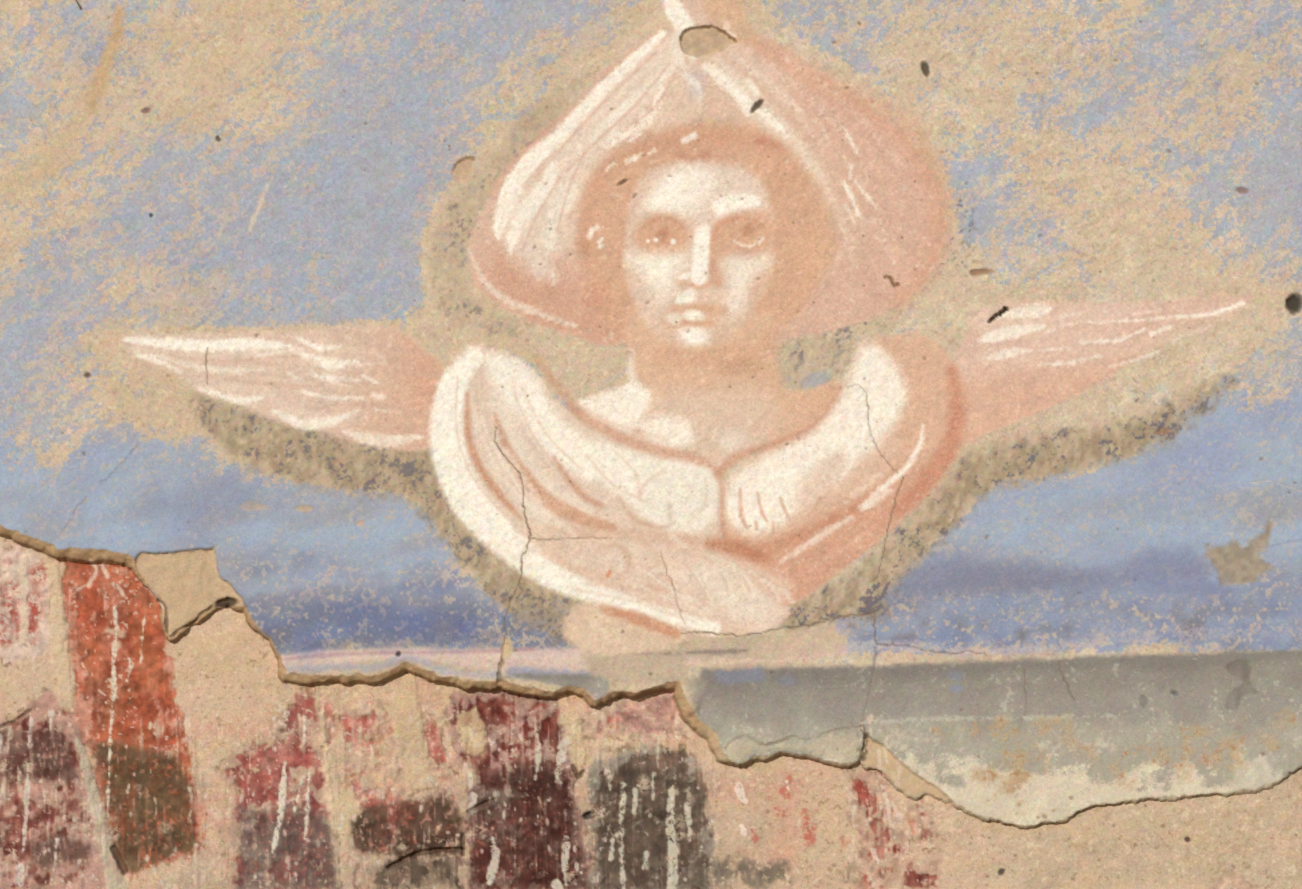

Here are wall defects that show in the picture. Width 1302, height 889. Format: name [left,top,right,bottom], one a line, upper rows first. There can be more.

peeling [680,24,737,57]
crack [493,426,612,684]
spalling [0,521,1302,889]
crack [660,384,992,762]